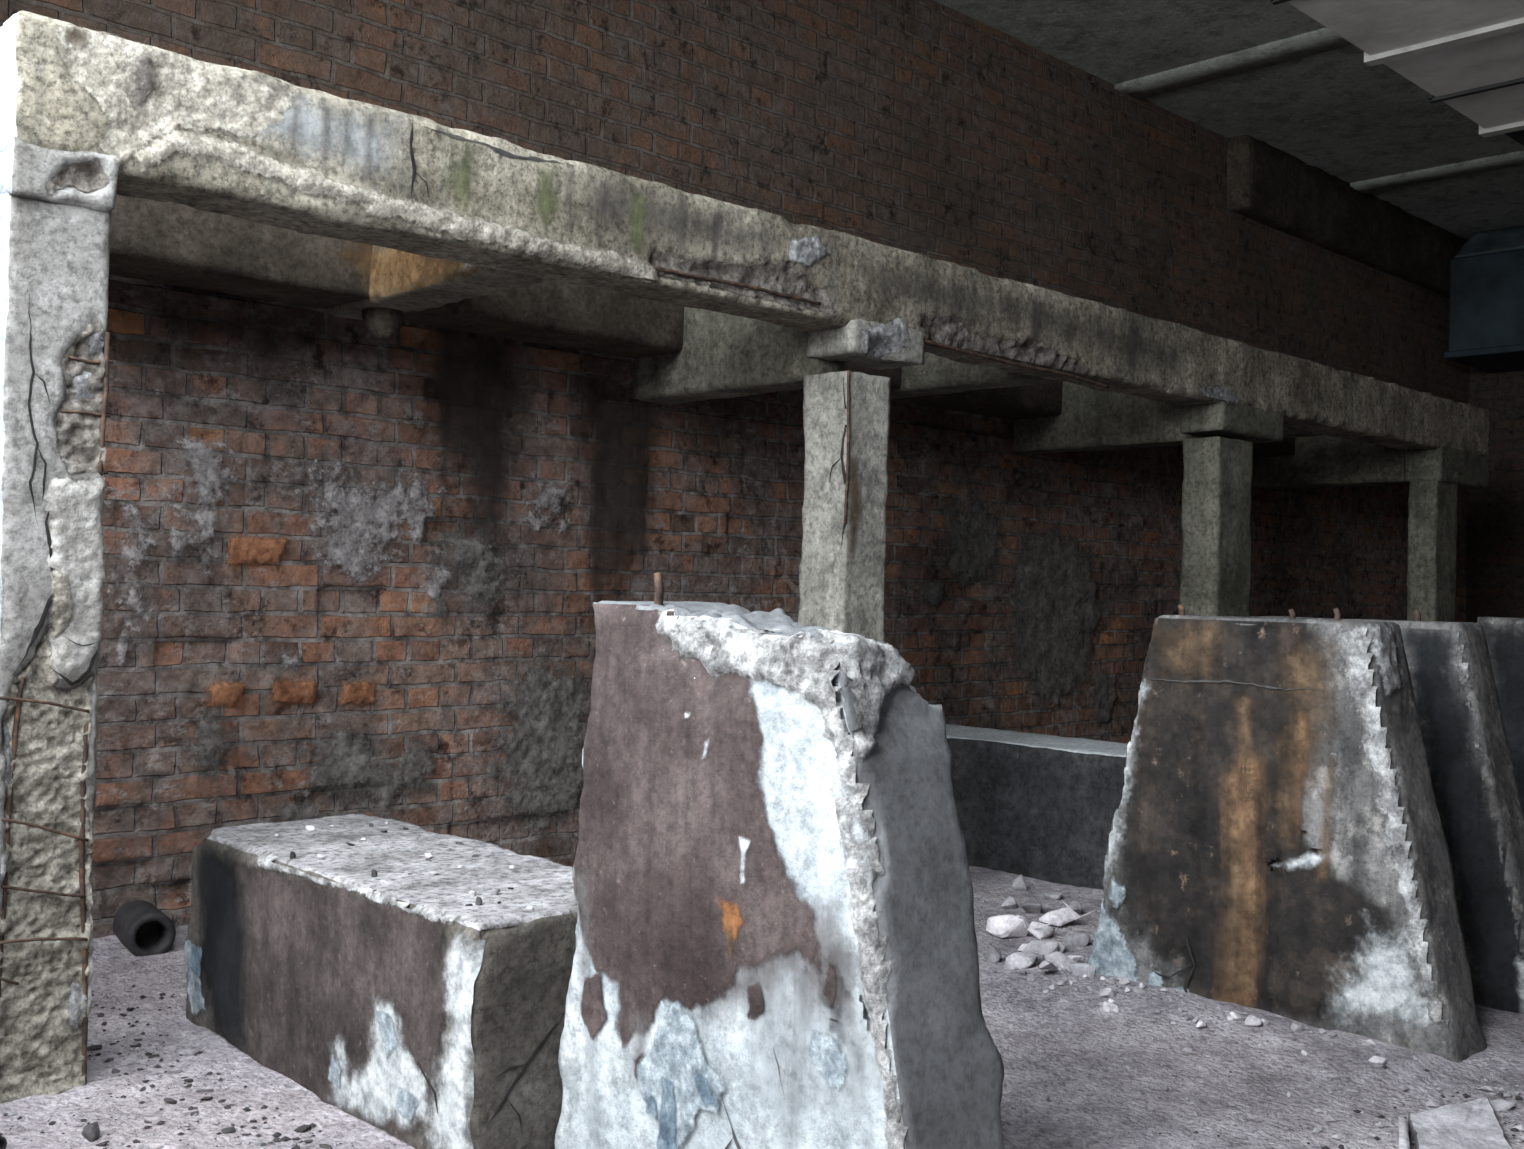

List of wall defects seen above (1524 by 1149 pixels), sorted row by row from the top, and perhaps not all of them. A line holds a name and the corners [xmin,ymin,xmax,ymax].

crack [28,293,50,524]
spalling [0,316,289,1103]
peeling [185,852,484,1149]
peeling [486,603,914,1149]
crack [721,1094,741,1149]
water stain [1133,639,1201,957]
corrosion [1218,702,1261,1007]
water stain [1252,623,1430,1023]